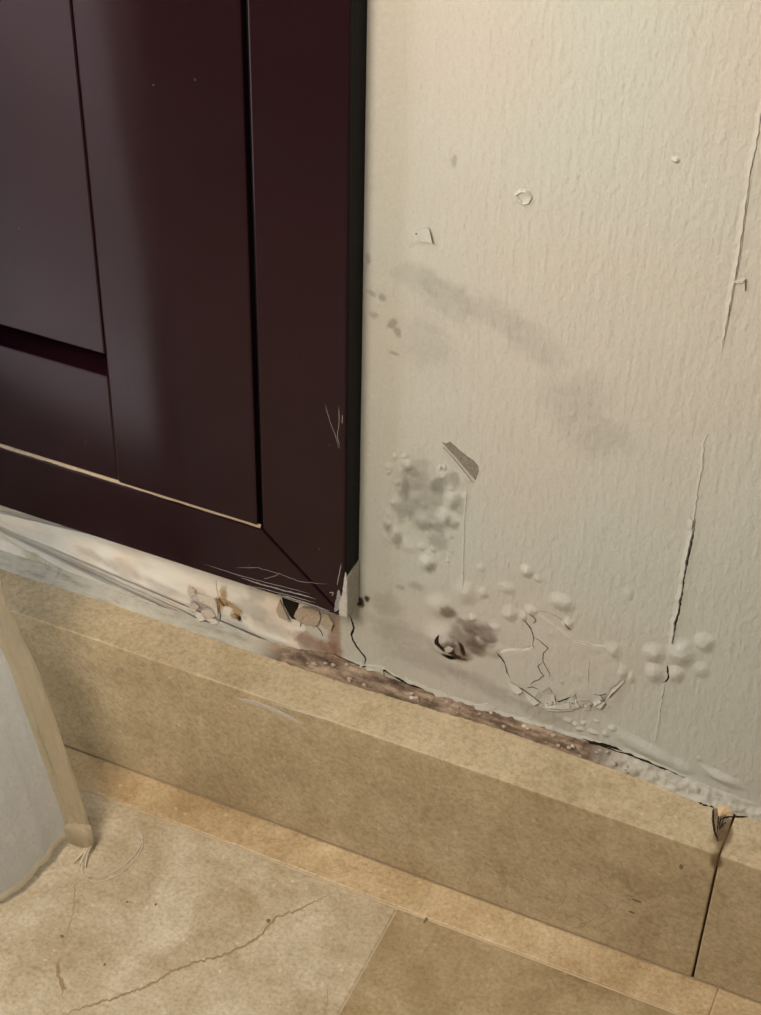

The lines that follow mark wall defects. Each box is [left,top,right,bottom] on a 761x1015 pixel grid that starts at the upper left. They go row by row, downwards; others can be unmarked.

crack [720,101,761,357]
peeling [440,442,479,595]
peeling [187,585,221,625]
flaking render [276,597,334,636]
crack [334,429,716,788]